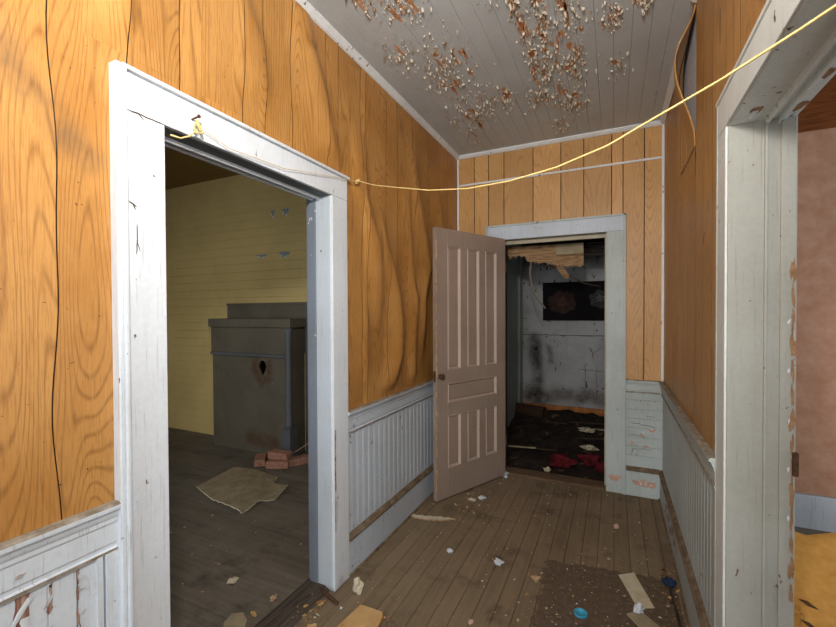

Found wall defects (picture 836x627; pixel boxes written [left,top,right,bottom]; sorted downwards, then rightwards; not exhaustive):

peeling [351,0,654,151]
peeling [11,593,33,627]
peeling [42,577,55,614]
peeling [75,569,96,625]